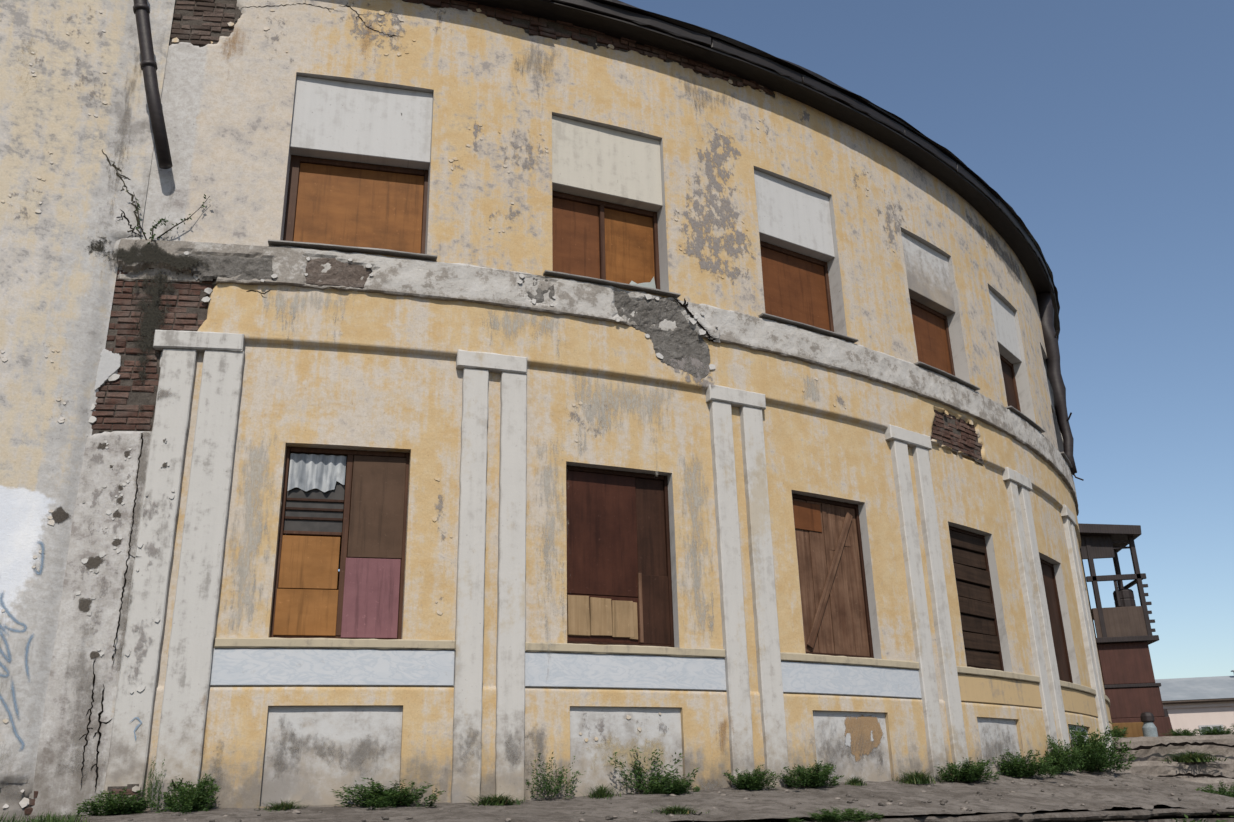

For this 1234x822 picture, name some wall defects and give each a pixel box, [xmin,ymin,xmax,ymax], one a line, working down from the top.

flaking render [169,0,242,47]
crack [250,3,401,37]
flaking render [341,0,775,98]
peeling [667,128,754,285]
spalling [614,290,720,389]
flaking render [74,251,278,659]
flaking render [931,410,984,465]
spalling [47,507,69,526]
crack [79,433,143,791]
peeling [844,715,883,762]